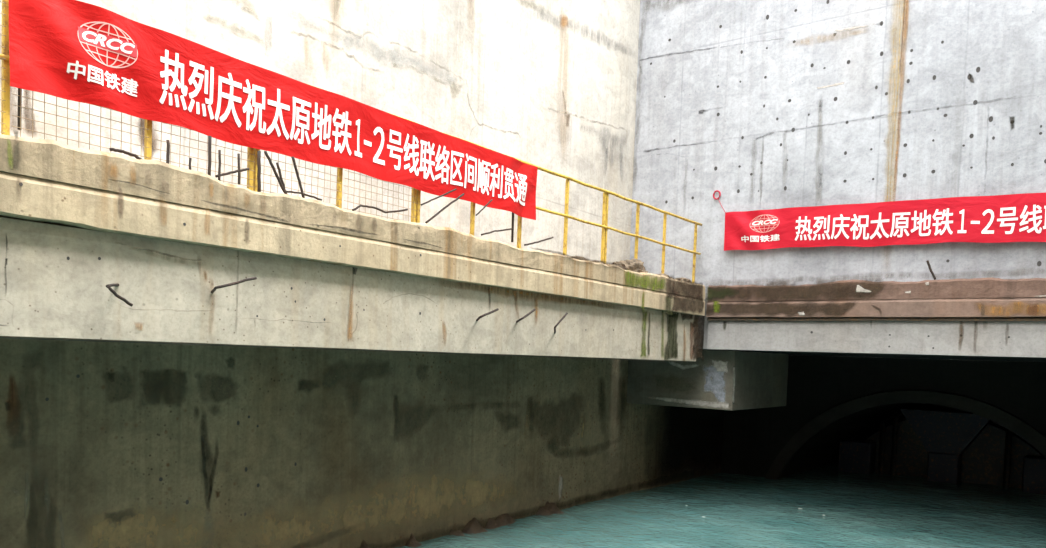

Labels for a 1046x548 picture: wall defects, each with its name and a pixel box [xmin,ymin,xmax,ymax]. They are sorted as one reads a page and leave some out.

rust [885,0,908,202]
leakage [195,409,219,506]
leakage [556,406,724,509]